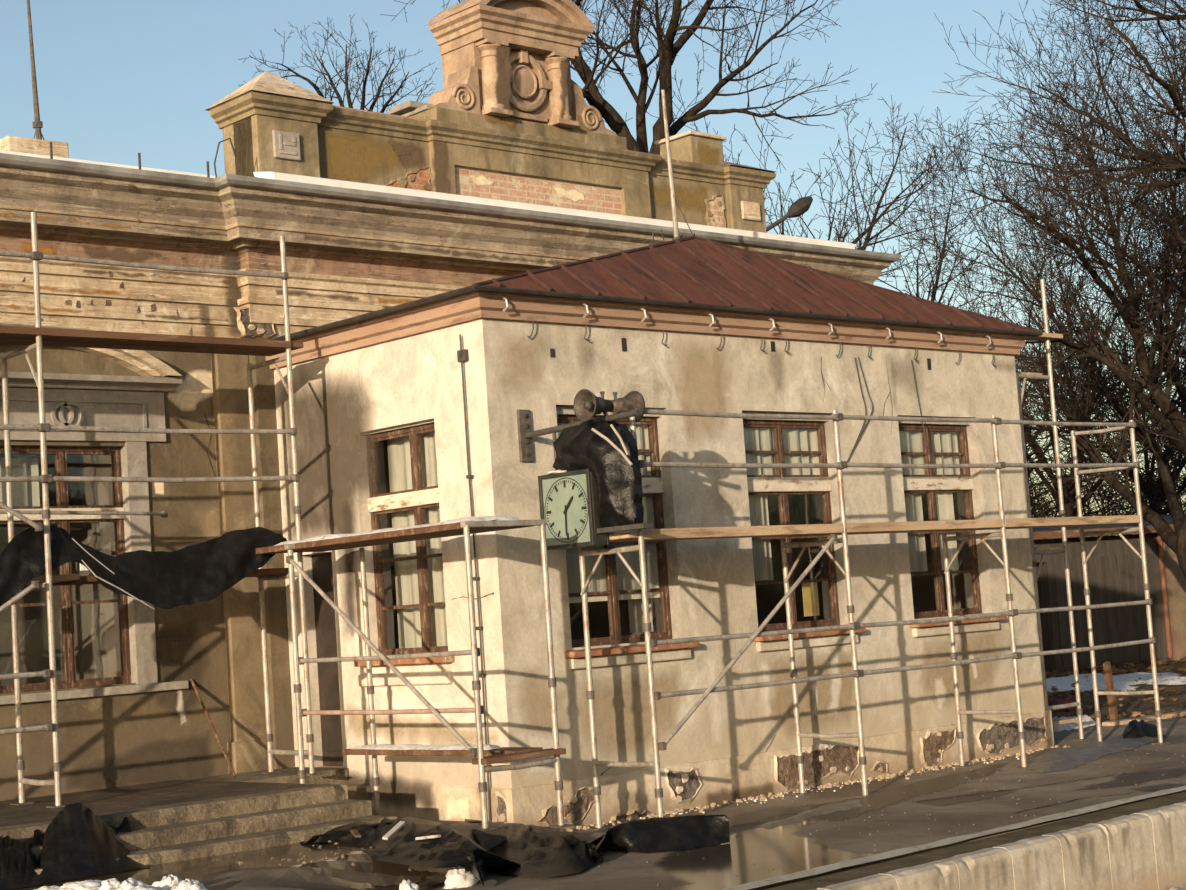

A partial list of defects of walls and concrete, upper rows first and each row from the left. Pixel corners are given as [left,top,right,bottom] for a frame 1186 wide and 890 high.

flaking render [384,166,432,191]
peeling [472,175,493,185]
peeling [553,186,584,202]
flaking render [704,194,726,228]
flaking render [919,727,956,767]
flaking render [977,715,1048,755]
flaking render [665,767,704,804]
flaking render [774,743,889,792]
flaking render [536,786,595,828]